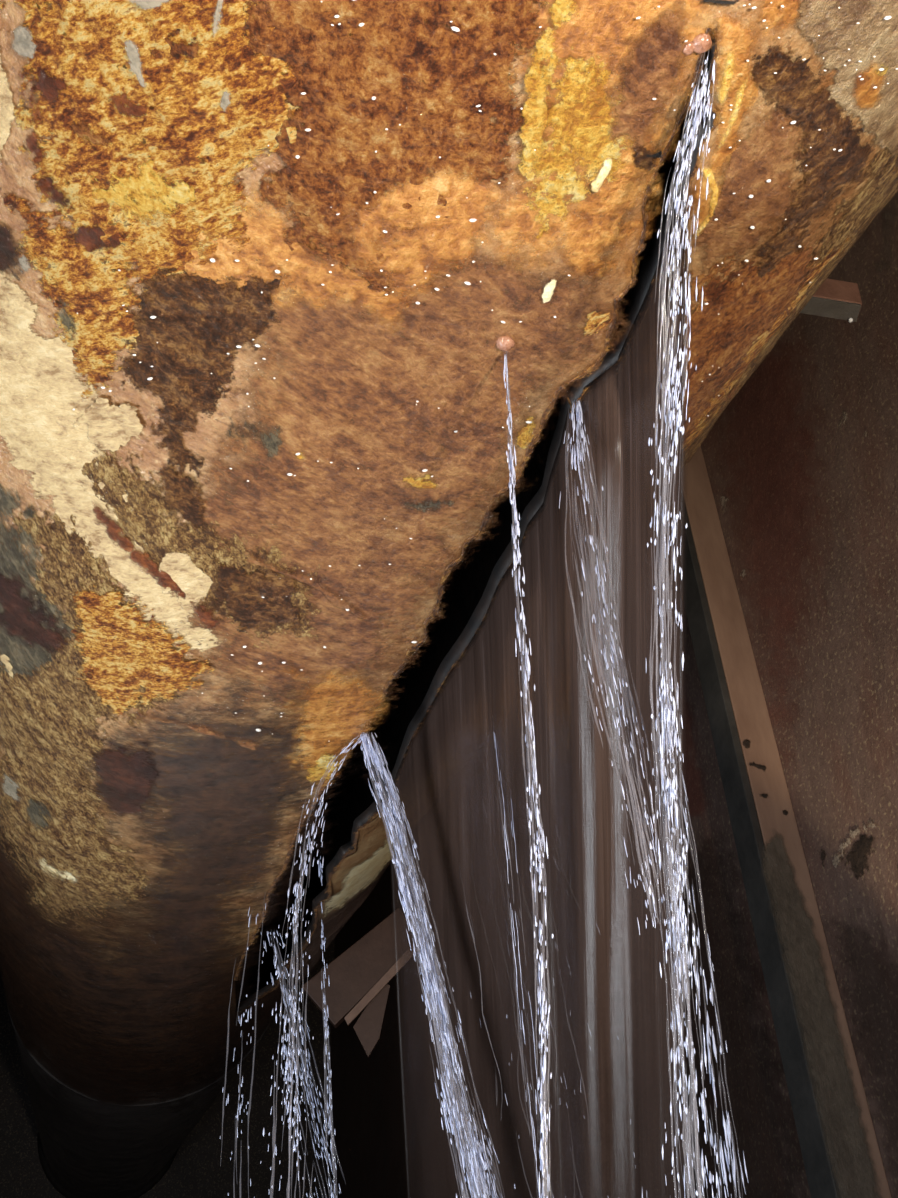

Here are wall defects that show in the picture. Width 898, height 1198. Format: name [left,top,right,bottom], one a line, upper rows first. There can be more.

rust [0,0,898,933]
crack [234,0,739,1000]
spalling [819,820,876,880]